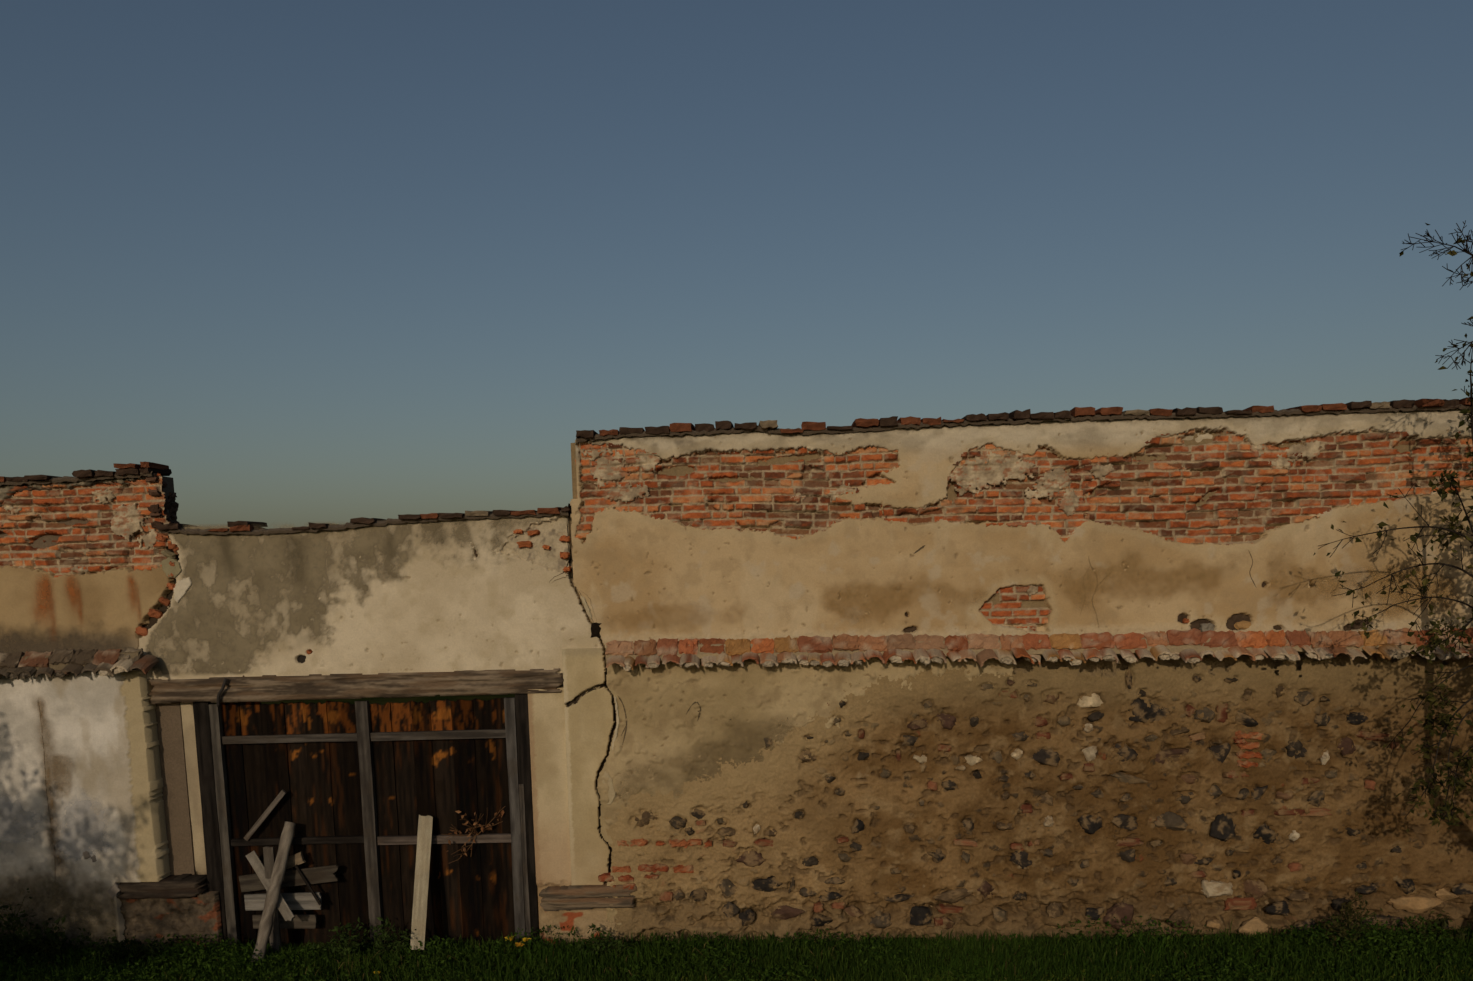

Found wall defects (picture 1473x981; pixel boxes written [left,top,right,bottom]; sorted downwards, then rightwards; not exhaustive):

spalling [0,474,178,577]
spalling [501,429,1473,574]
spalling [979,585,1052,632]
crack [550,503,627,884]
spalling [598,656,1473,944]